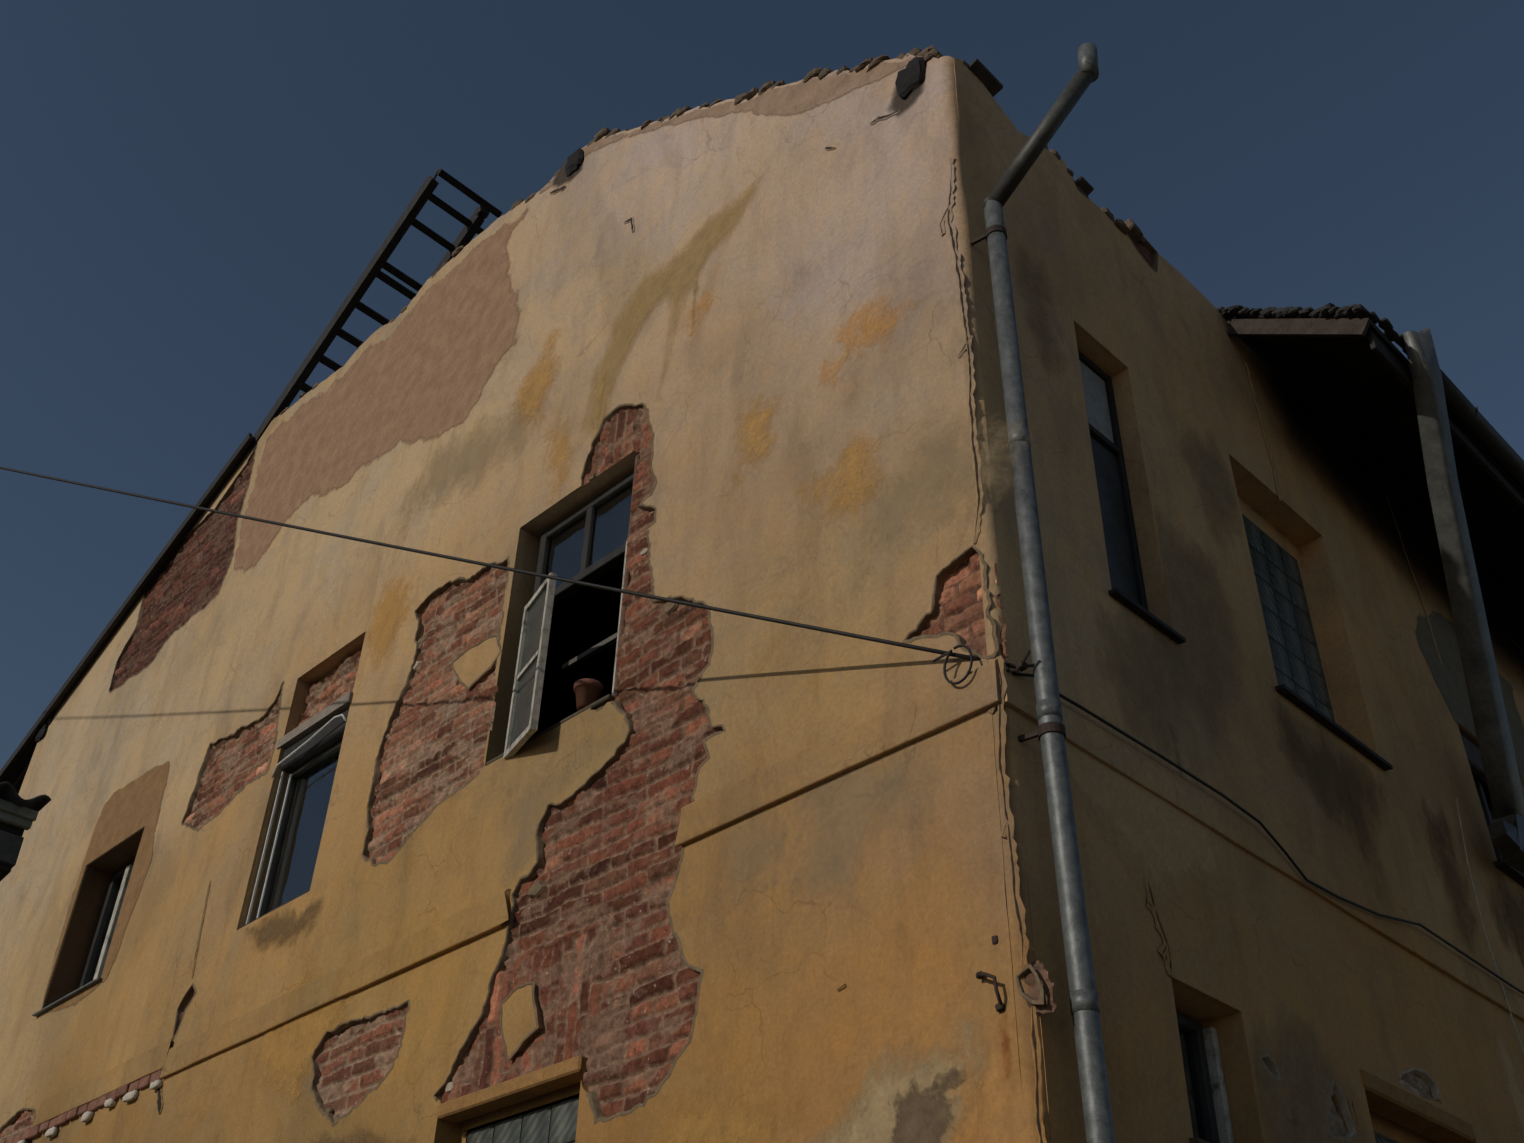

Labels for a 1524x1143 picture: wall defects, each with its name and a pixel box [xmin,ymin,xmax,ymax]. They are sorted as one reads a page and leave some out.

leakage [590,194,748,429]
crack [938,156,984,543]
flaking render [109,445,257,693]
flaking render [181,681,285,831]
flaking render [361,556,510,867]
flaking render [433,403,726,1124]
flaking render [902,545,1008,661]
crack [988,655,1029,966]
flaking render [0,1070,163,1143]
flaking render [262,998,410,1127]
leakage [818,1026,980,1143]
crack [1030,1006,1047,1143]